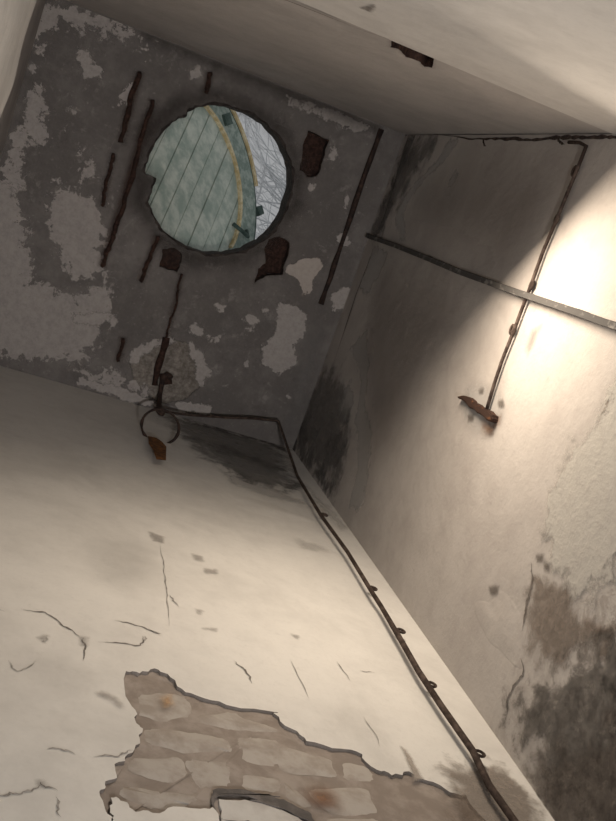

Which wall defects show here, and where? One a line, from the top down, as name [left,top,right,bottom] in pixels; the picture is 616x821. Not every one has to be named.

rust [118,71,142,143]
peeling [0,0,225,415]
rust [100,100,155,268]
rust [300,132,326,177]
rust [255,237,287,279]
peeling [285,258,323,295]
peeling [241,302,307,376]
crack [160,548,178,615]
crack [27,610,87,659]
crack [109,620,161,646]
damp [449,578,616,821]
spalling [100,671,469,821]